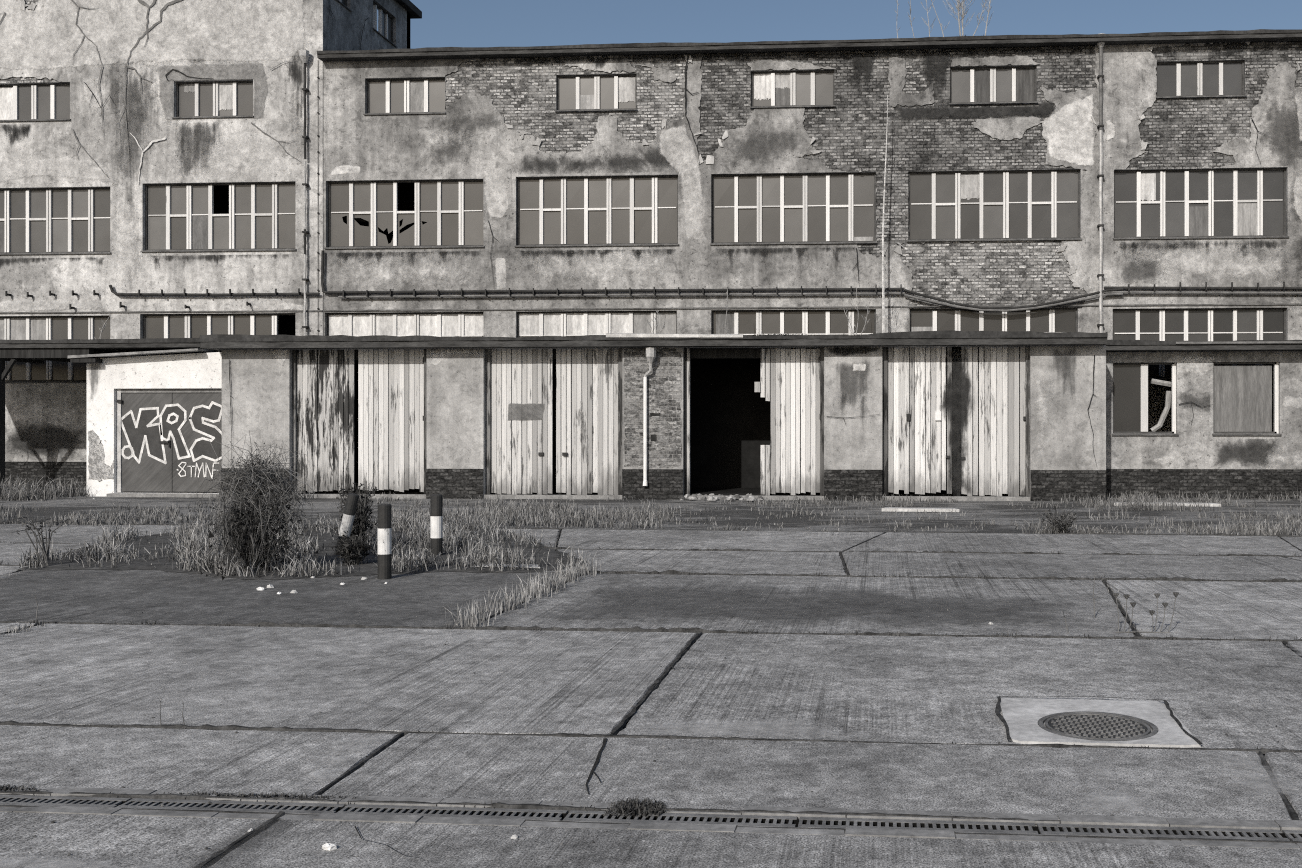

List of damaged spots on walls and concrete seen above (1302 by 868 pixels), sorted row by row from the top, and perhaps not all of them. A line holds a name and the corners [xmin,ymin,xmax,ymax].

crack [71,0,214,183]
peeling [0,0,304,107]
leakage [180,124,282,173]
flaking render [445,46,1115,310]
flaking render [1125,41,1302,170]
leakage [1264,103,1302,163]
peeling [1294,178,1302,220]
leakage [1121,241,1278,281]
leakage [942,347,972,492]